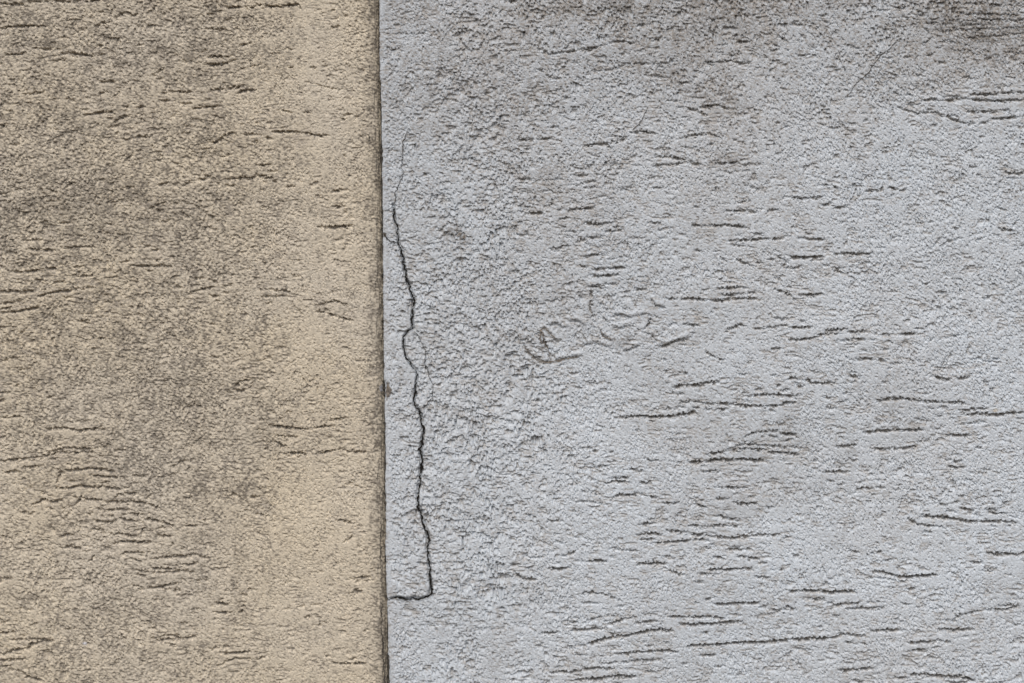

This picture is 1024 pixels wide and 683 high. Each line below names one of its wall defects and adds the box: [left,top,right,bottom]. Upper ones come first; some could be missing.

crack [380,133,433,683]